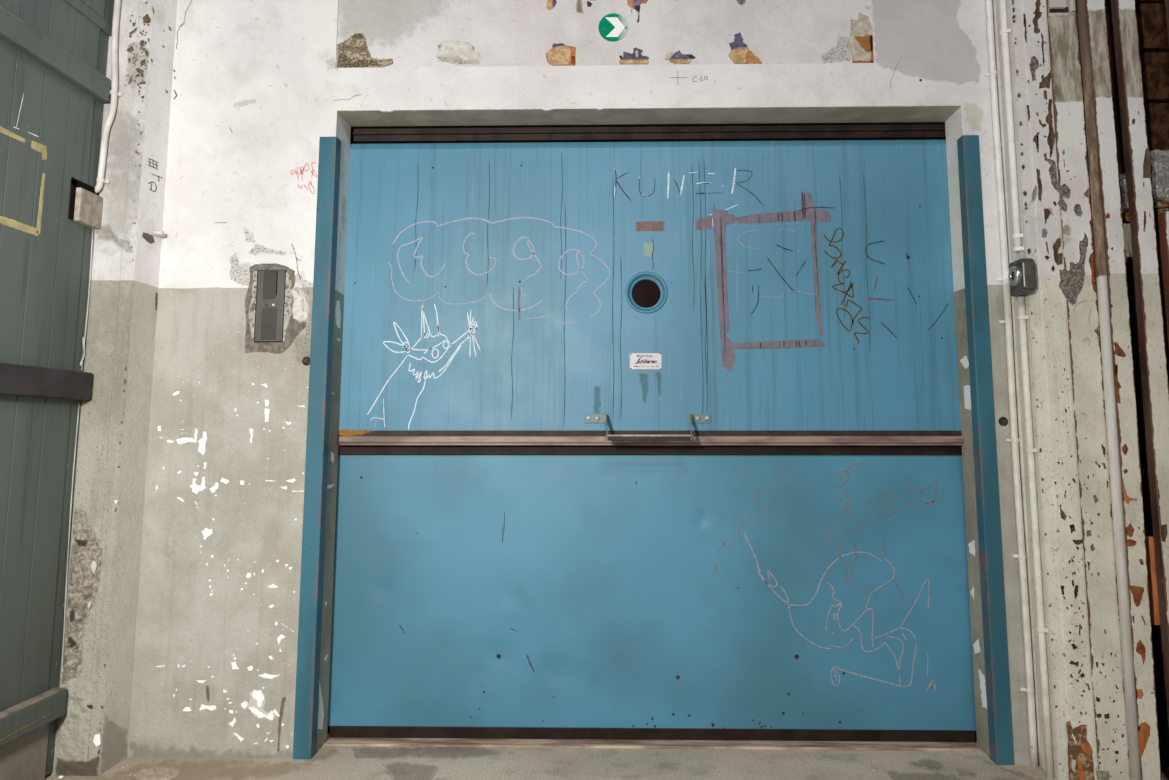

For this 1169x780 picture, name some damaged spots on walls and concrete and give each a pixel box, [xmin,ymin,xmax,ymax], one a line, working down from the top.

peeling [627,0,648,23]
spalling [336,33,394,68]
flaking render [546,43,576,66]
flaking render [619,48,649,65]
flaking render [664,50,696,64]
flaking render [728,33,762,64]
peeling [1012,0,1127,305]
spalling [292,286,310,322]
spalling [249,383,291,455]
spalling [158,425,250,508]
spalling [61,508,102,684]
spalling [173,654,289,749]